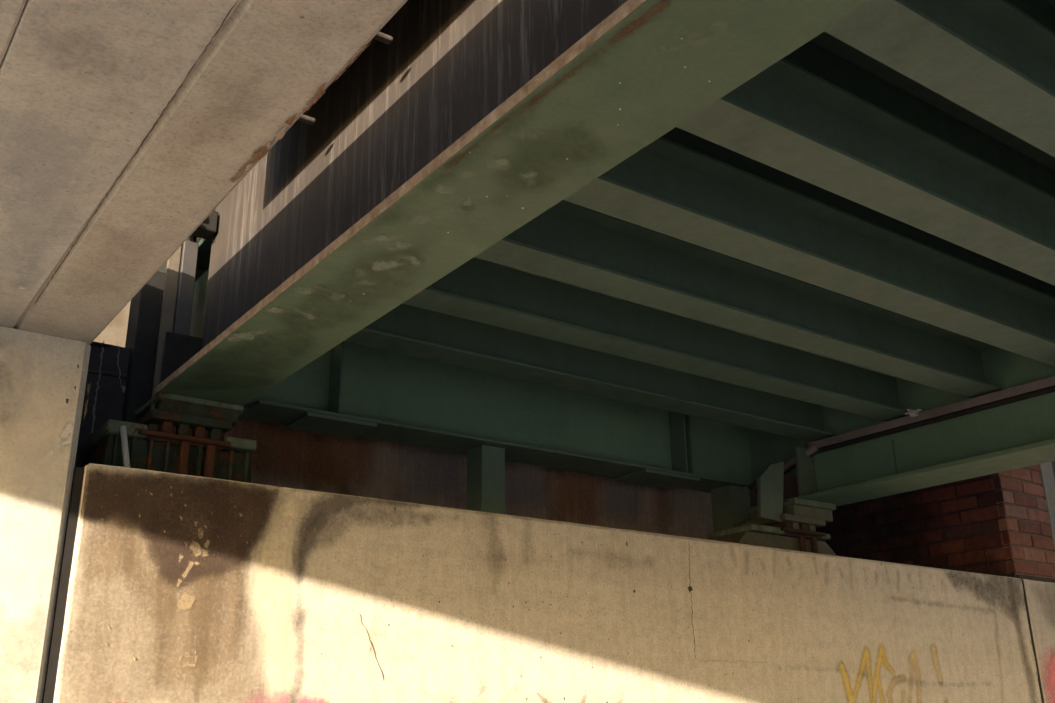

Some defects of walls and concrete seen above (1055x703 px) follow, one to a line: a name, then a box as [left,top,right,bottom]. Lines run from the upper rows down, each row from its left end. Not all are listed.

corrosion [153,0,670,395]
water stain [69,469,411,703]
crack [359,613,384,681]
crack [687,545,768,663]